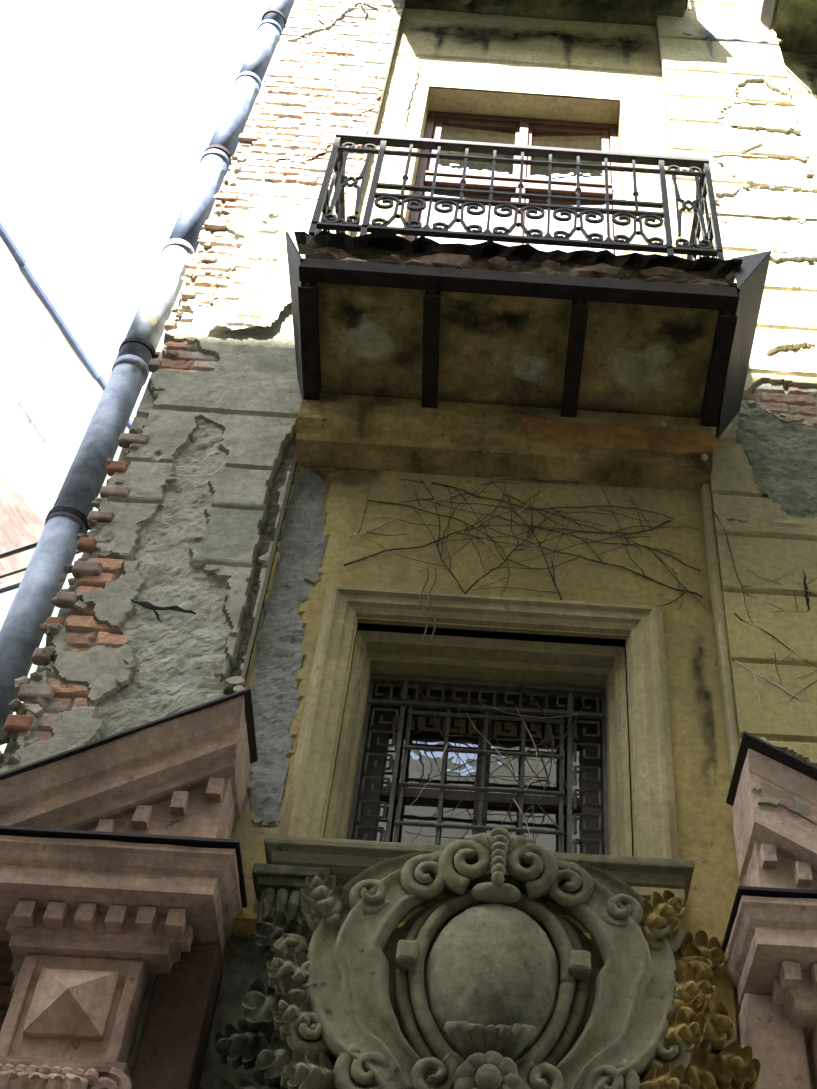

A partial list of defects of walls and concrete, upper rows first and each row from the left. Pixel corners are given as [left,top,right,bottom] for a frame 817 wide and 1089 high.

flaking render [310,44,353,58]
crack [287,2,397,41]
leakage [414,26,650,56]
crack [400,60,421,134]
spalling [713,81,817,291]
flaking render [148,73,381,397]
spalling [0,418,330,828]